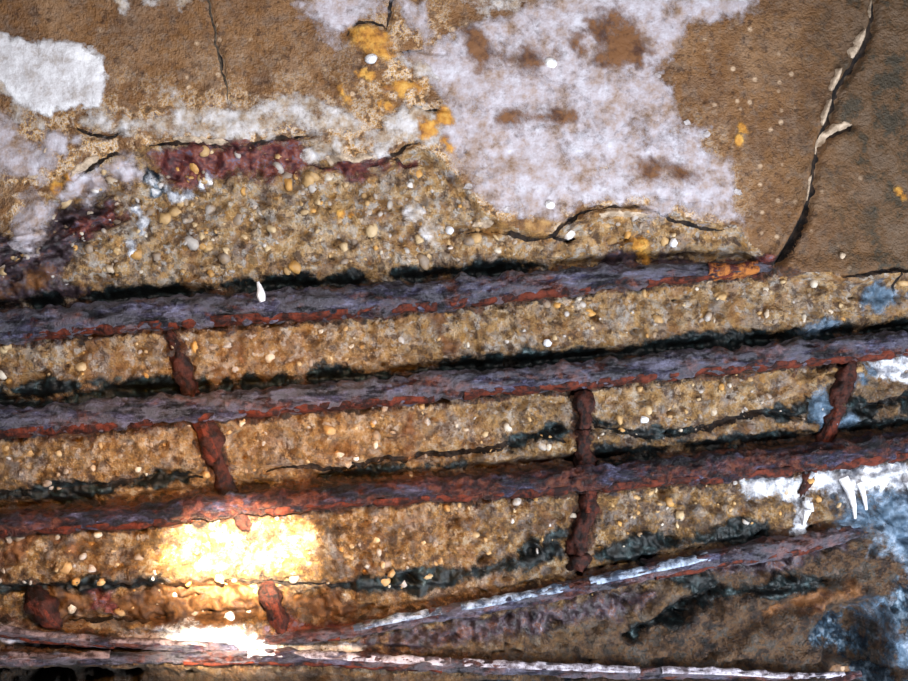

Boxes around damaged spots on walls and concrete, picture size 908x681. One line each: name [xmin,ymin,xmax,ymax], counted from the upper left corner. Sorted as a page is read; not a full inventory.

efflorescence [126,204,150,256]
efflorescence [146,174,210,203]
rust [143,139,418,198]
spalling [0,0,908,409]
crack [766,0,874,266]
spalling [214,390,579,494]
spalling [588,363,842,466]
rust [584,453,908,513]
rust [27,578,358,642]
spalling [0,471,908,681]
rust [350,543,862,656]
leakage [661,463,908,681]